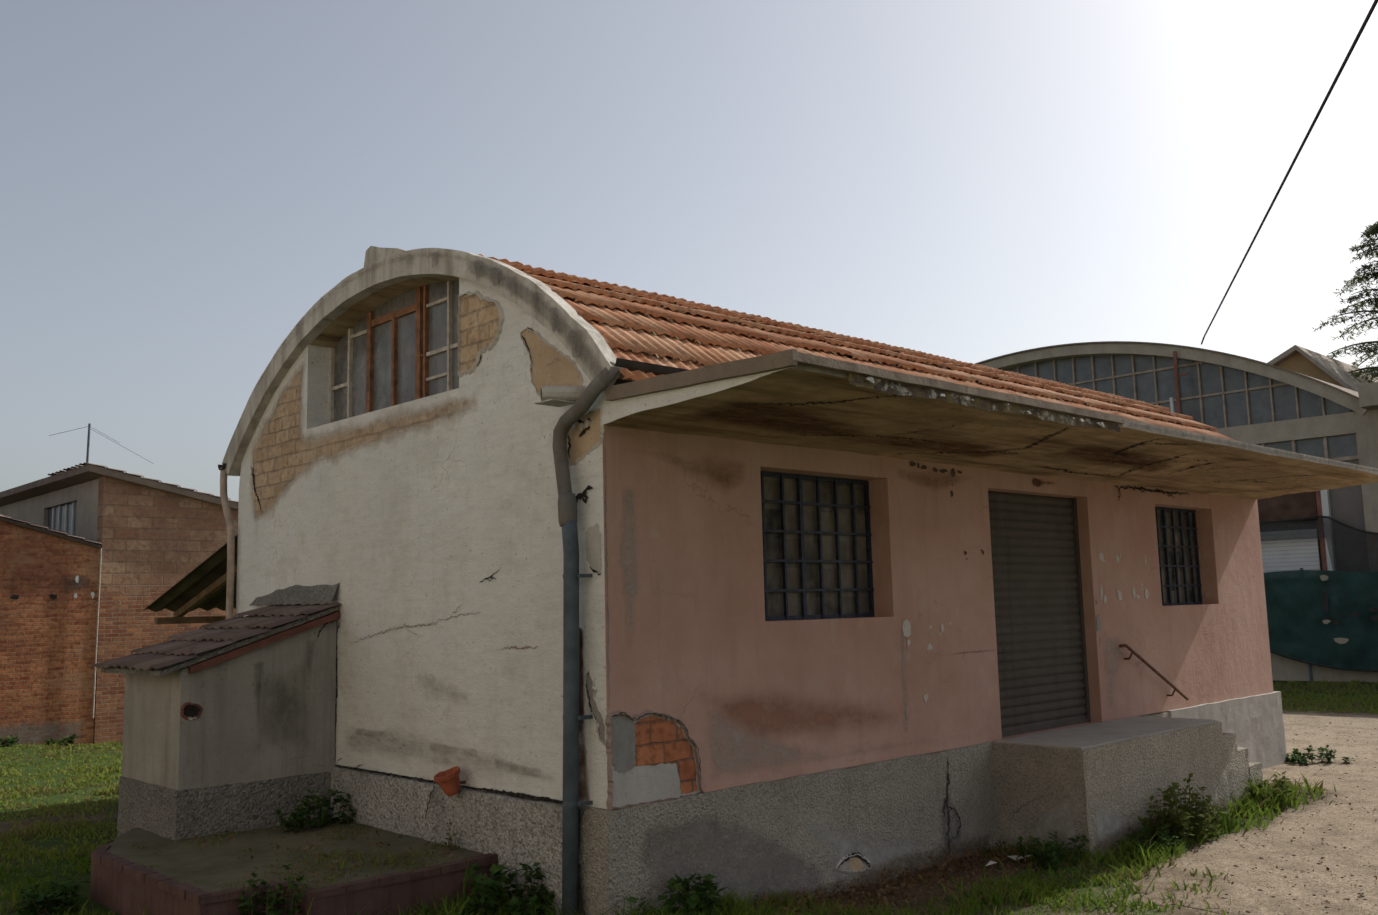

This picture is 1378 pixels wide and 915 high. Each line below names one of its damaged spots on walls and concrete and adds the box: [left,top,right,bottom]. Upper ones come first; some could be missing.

flaking render [457,290,505,378]
peeling [520,327,584,396]
spalling [848,373,1120,432]
crack [317,569,500,819]
flaking render [584,669,704,811]
crack [943,759,961,854]
spalling [835,852,872,874]